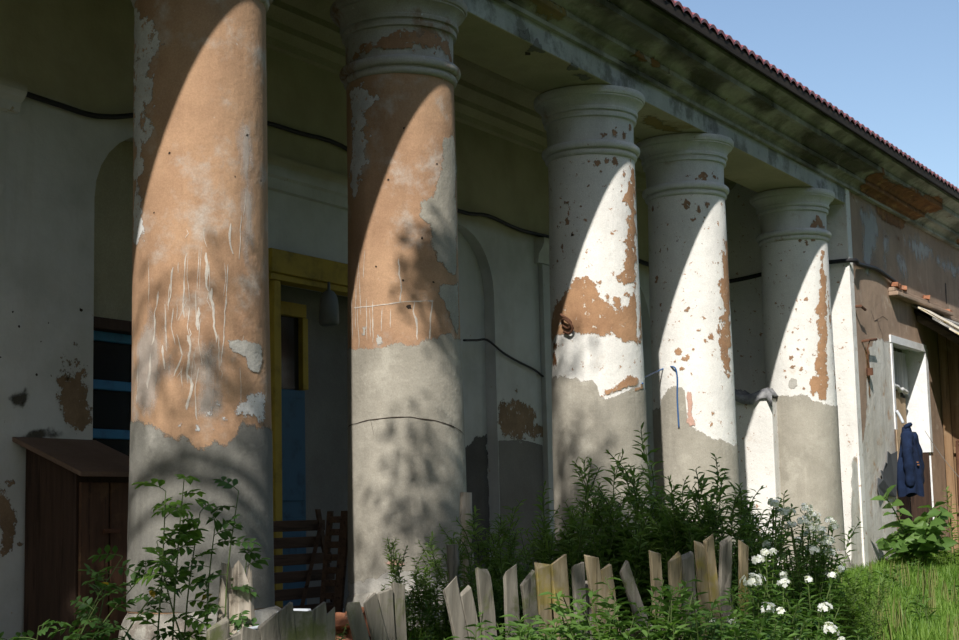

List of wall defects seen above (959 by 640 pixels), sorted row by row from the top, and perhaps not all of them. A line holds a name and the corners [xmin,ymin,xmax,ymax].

damp [655,19,720,95]
peeling [133,8,165,245]
peeling [551,157,642,345]
flaking render [851,168,956,275]
peeling [697,241,731,378]
peeling [778,215,836,401]
flaking render [51,354,93,432]
peeling [206,392,266,423]
flaking render [227,340,263,372]
crack [347,417,464,435]
peeling [601,375,643,397]
peeling [668,338,694,375]